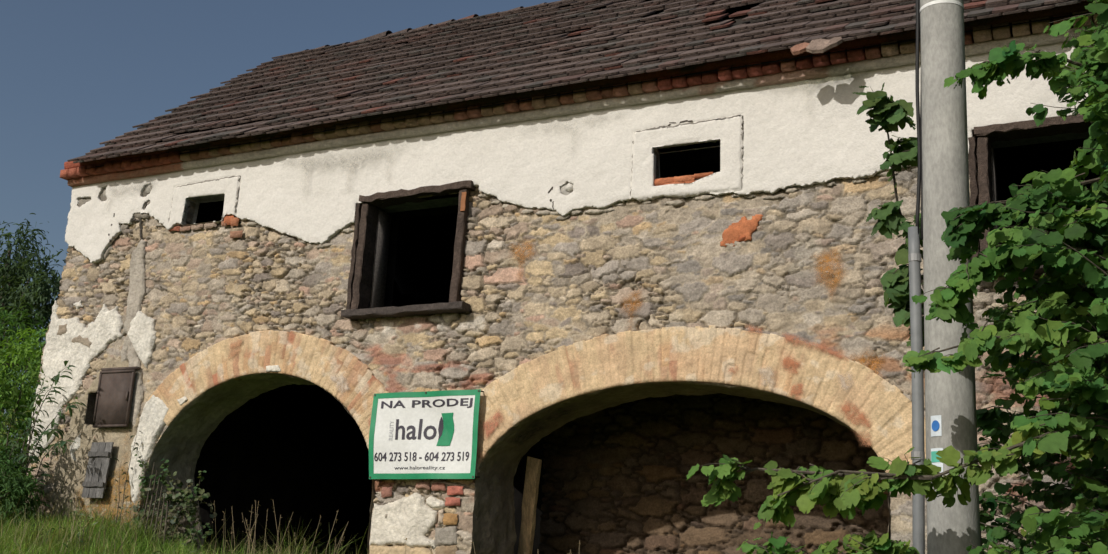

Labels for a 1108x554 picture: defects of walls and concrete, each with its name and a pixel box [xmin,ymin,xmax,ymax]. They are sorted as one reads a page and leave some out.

spalling [560,182,573,195]
flaking render [731,187,798,200]
flaking render [642,195,715,206]
flaking render [120,184,176,233]
flaking render [522,203,625,220]
flaking render [224,215,258,227]
flaking render [720,214,763,247]
flaking render [280,235,333,248]